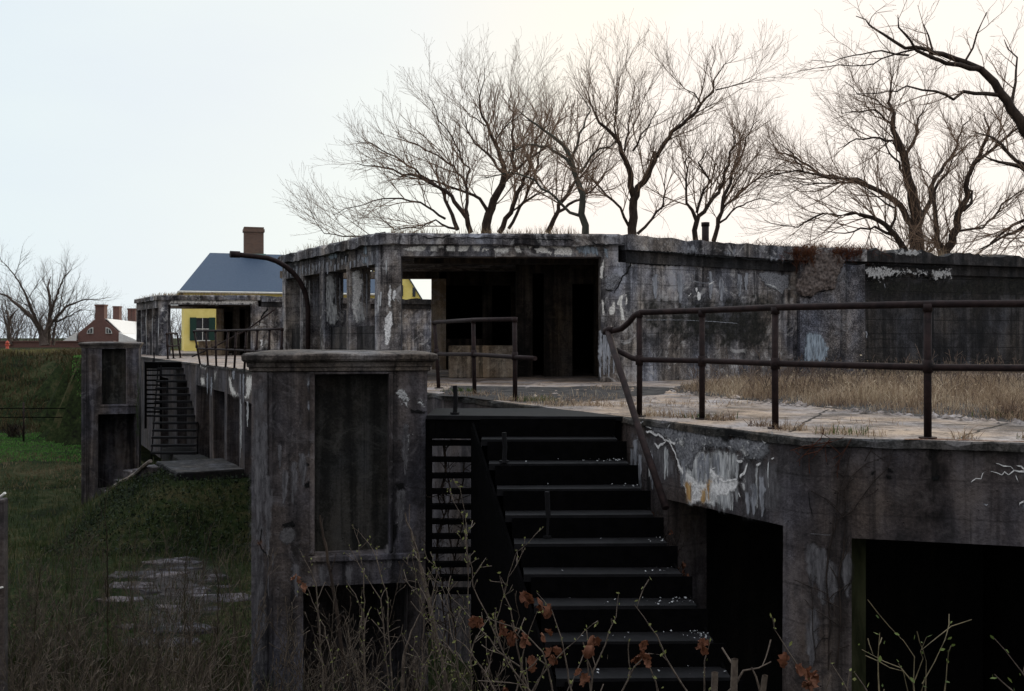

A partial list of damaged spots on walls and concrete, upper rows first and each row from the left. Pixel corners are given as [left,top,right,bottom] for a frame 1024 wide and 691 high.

peeling [377,288,397,345]
peeling [601,294,627,320]
peeling [598,331,615,378]
spalling [640,418,773,471]